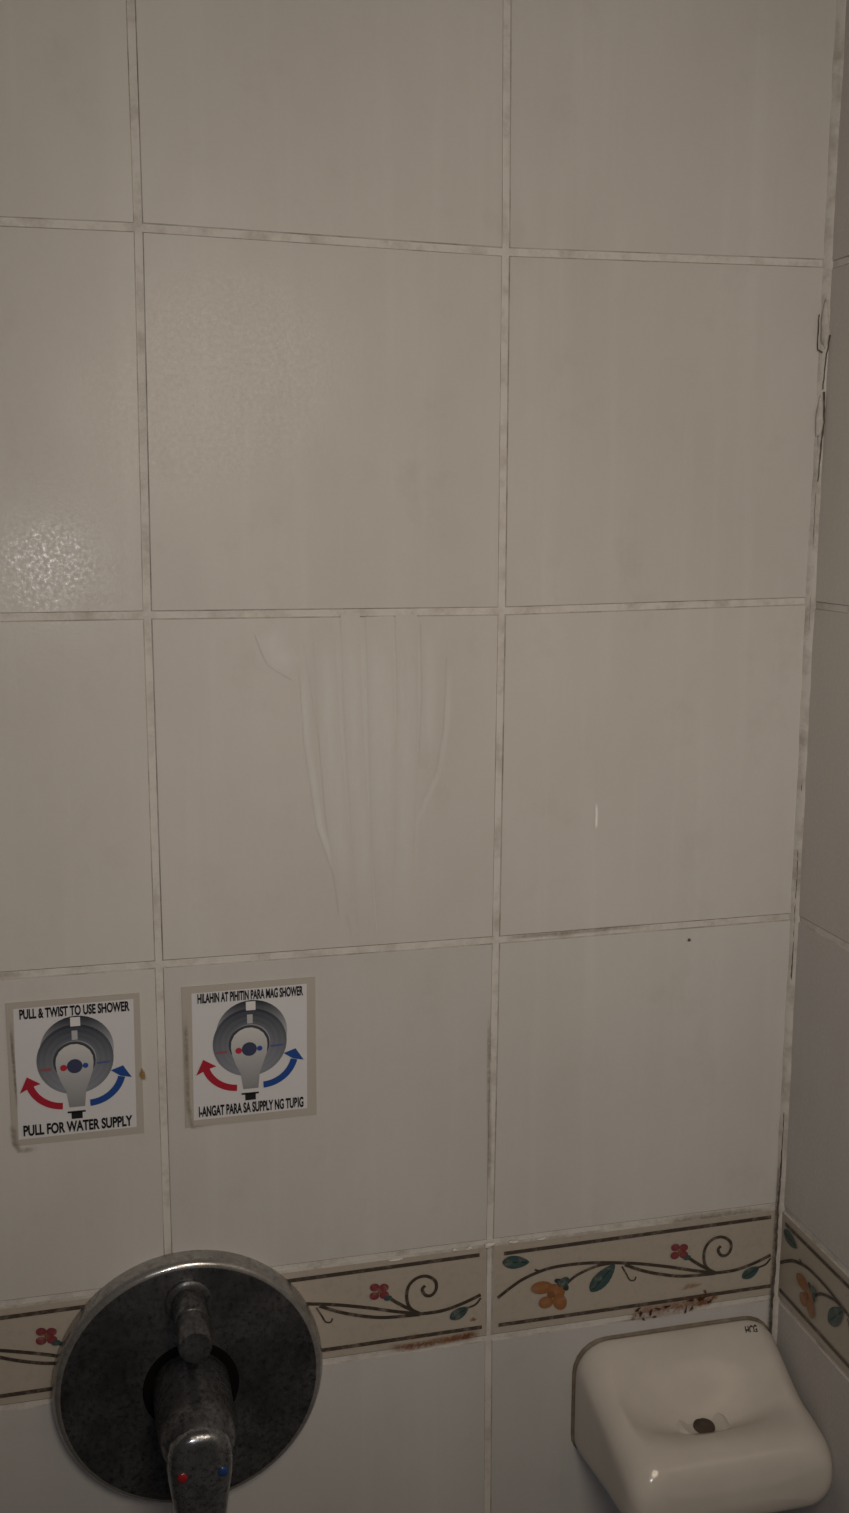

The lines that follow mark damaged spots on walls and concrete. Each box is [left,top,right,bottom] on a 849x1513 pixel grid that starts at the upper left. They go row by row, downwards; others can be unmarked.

rust [632,1290,715,1320]
rust [397,1318,476,1349]